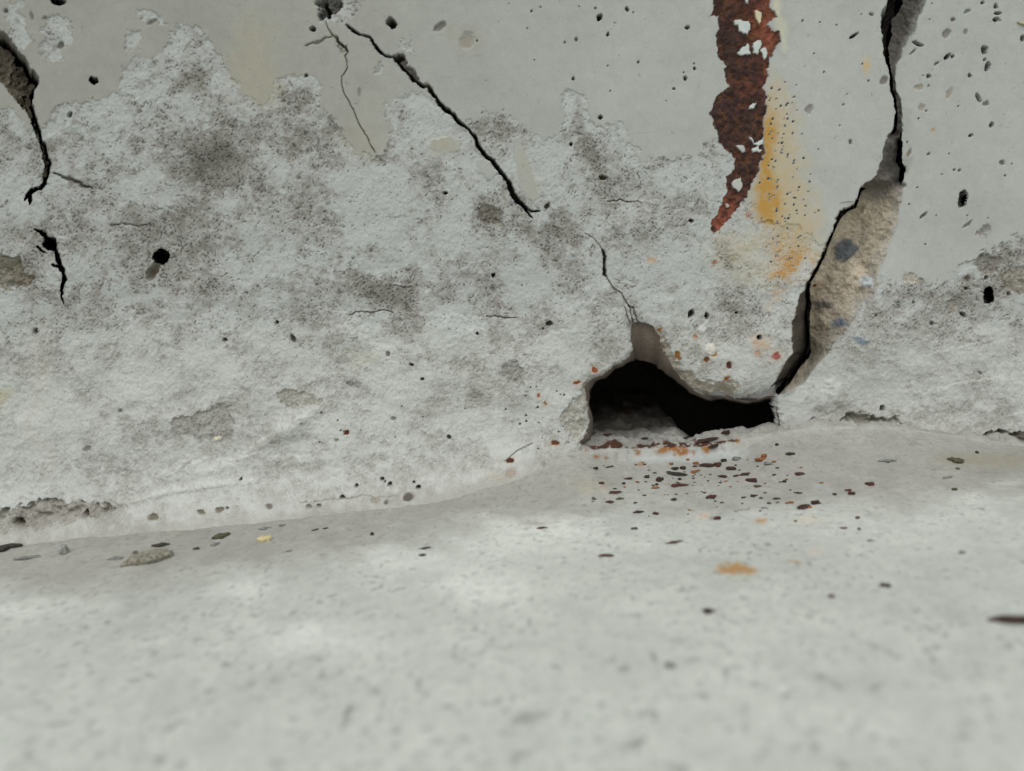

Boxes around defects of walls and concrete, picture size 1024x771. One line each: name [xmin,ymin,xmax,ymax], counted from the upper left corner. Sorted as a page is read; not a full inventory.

crack [0,30,94,304]
crack [304,2,541,218]
crack [585,232,639,323]
spalling [649,322,745,398]
corrosion [699,0,832,361]
crack [849,0,927,210]
corrosion [583,430,758,504]
corrosion [785,492,820,510]